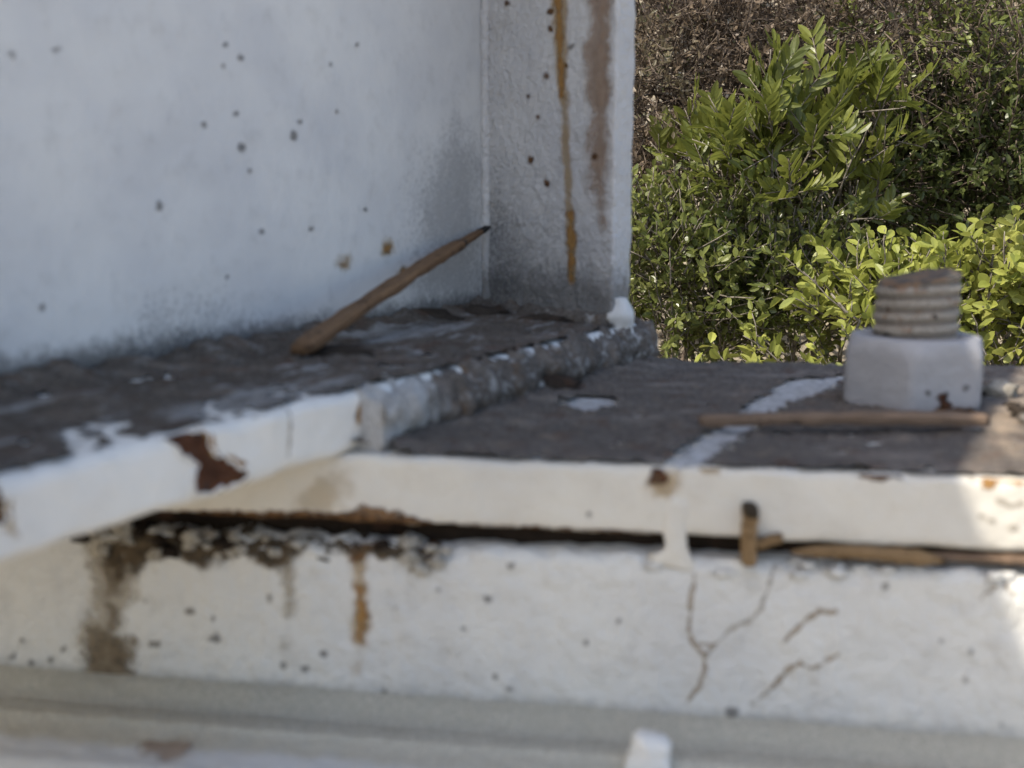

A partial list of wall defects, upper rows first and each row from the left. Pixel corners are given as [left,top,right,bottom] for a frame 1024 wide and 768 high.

rust [544,0,577,284]
spalling [70,522,452,581]
rust [349,541,374,644]
crack [687,574,715,701]
crack [770,608,838,689]